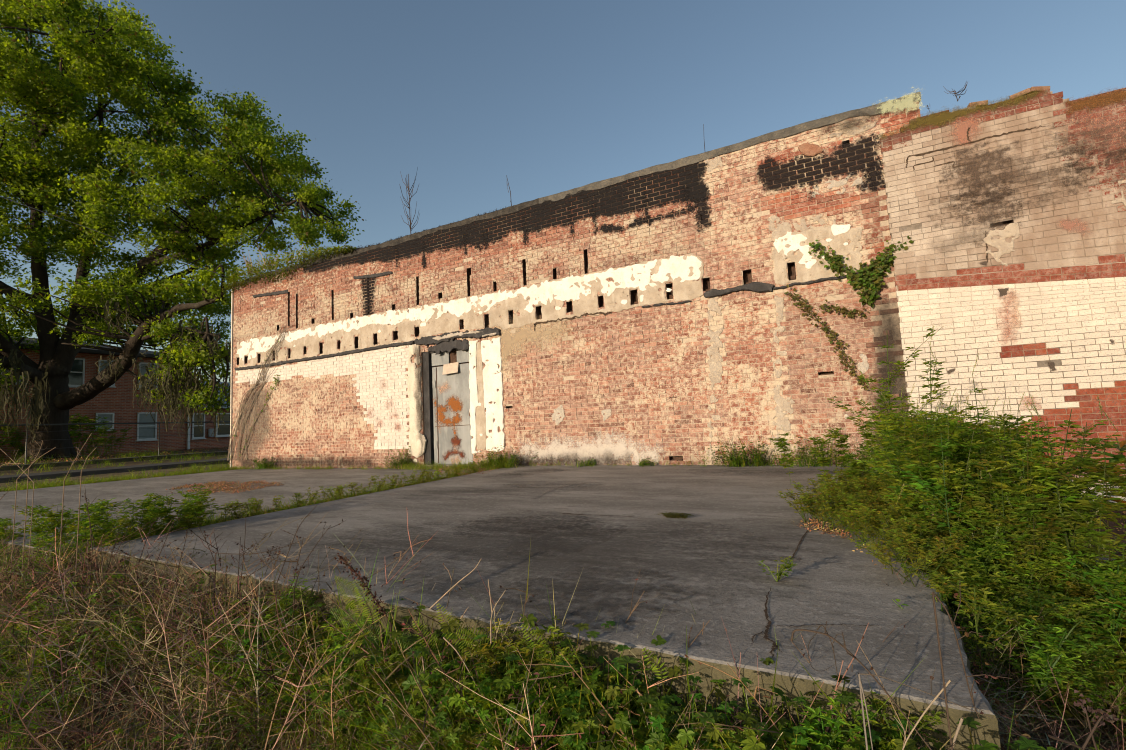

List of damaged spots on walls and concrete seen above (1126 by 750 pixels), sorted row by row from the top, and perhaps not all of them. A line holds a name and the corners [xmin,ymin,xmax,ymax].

leakage [694,186,712,232]
peeling [812,177,868,198]
leakage [950,129,1126,221]
flaking render [771,214,862,378]
flaking render [236,250,725,462]
peeling [992,342,1060,371]
rust [432,395,465,460]
peeling [1012,381,1126,486]
crack [751,587,884,658]